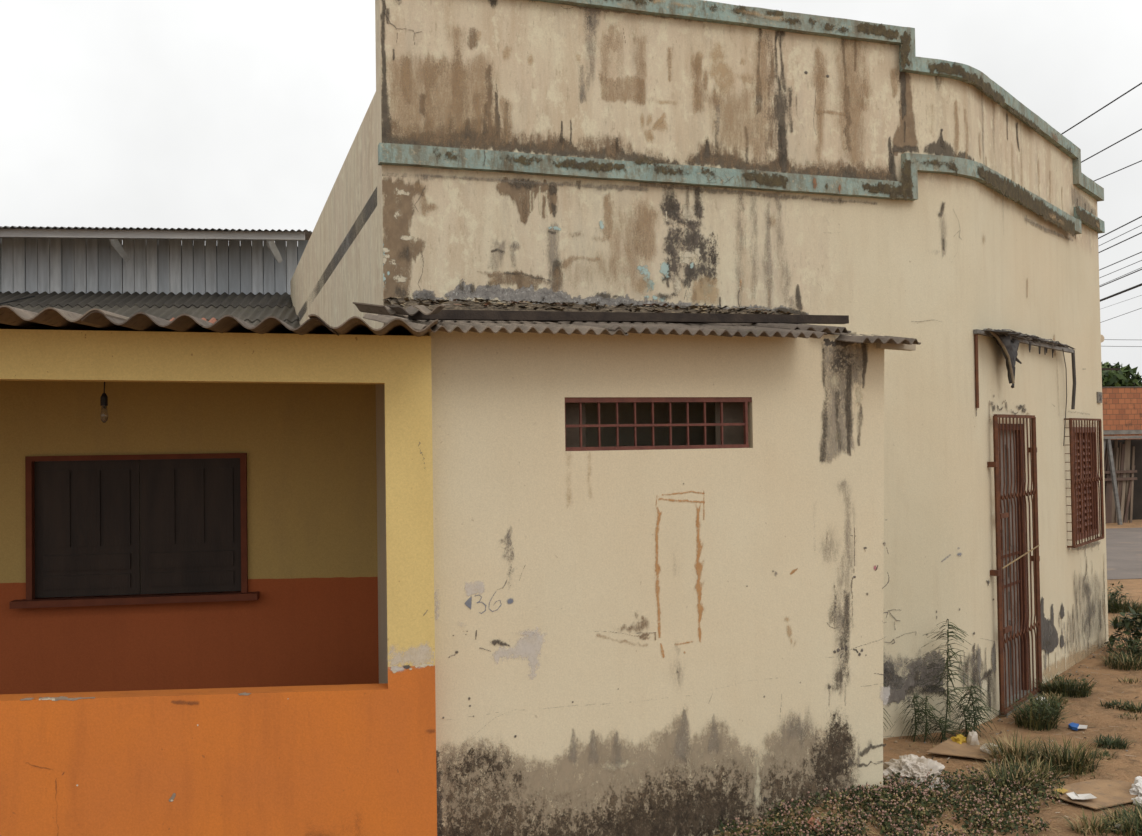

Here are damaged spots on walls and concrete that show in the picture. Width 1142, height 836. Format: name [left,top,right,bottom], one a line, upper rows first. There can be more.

water stain [380,0,1100,306]
peeling [382,178,435,304]
water stain [820,339,867,462]
peeling [391,646,433,673]
water stain [827,578,853,689]
water stain [959,638,996,720]
water stain [1067,541,1105,656]
water stain [436,710,886,836]